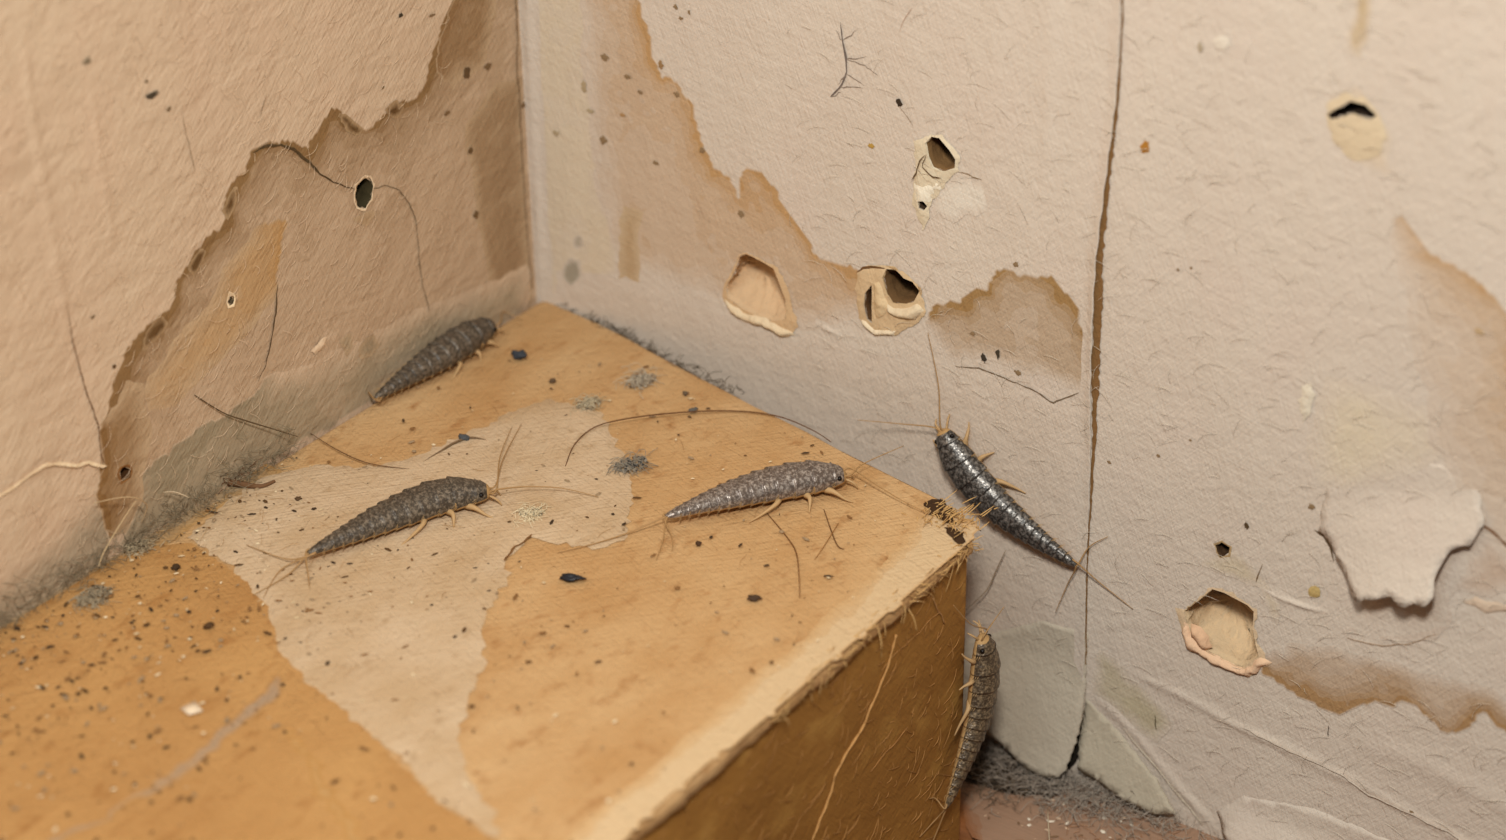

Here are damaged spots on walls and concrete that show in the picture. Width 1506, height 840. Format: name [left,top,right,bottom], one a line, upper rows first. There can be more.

spalling [1326,92,1387,161]
hole [354,175,375,211]
spalling [912,134,989,231]
damp [0,0,1093,641]
spalling [722,252,798,337]
spalling [855,265,926,336]
crack [957,0,1124,678]
damp [1306,214,1506,553]
spalling [1175,588,1272,677]
damp [1260,643,1506,734]
damp [982,734,1013,757]
crack [1064,714,1083,774]